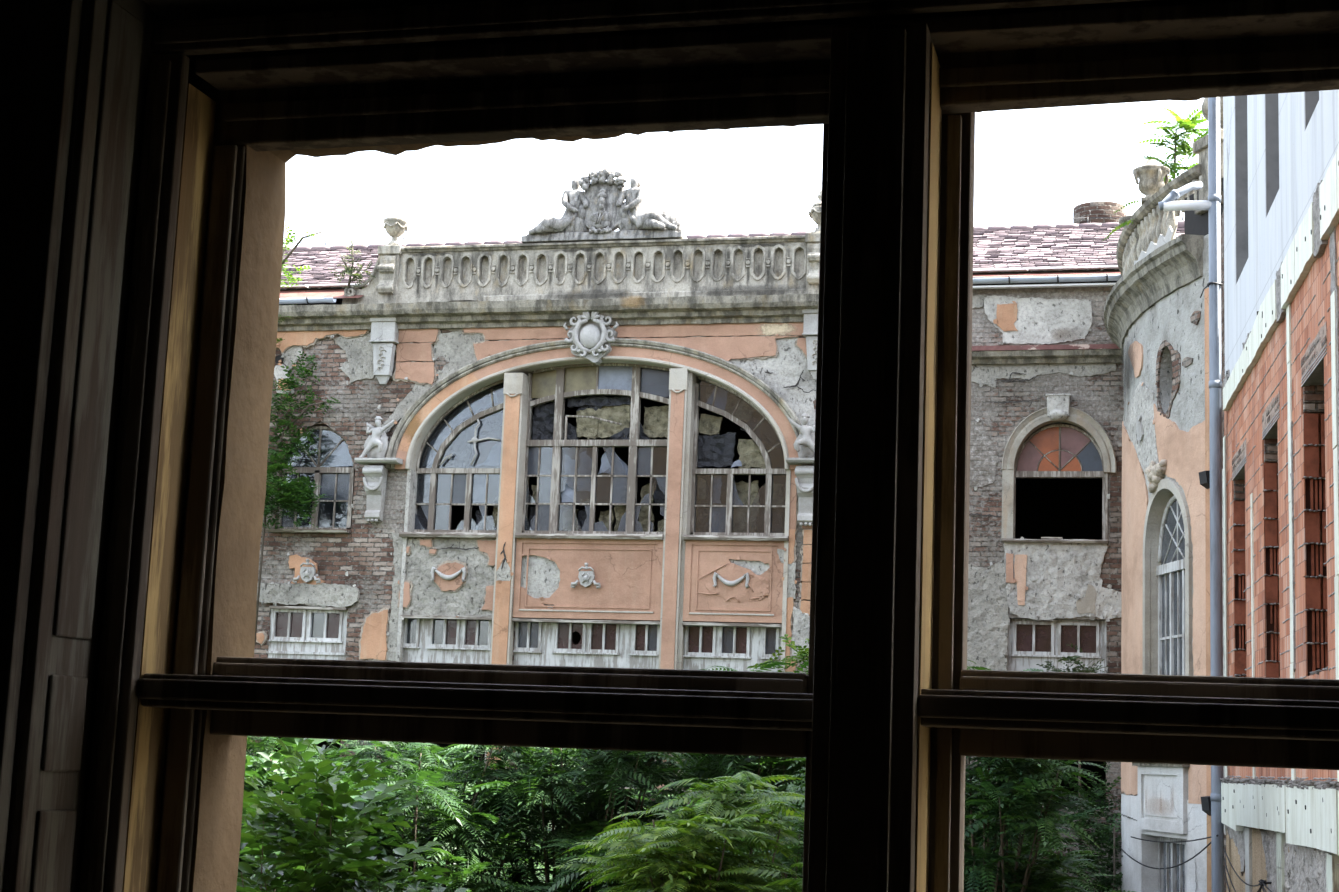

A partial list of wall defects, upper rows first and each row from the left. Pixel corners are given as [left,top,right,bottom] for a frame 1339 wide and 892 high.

flaking render [972,294,1092,345]
flaking render [1190,310,1201,325]
flaking render [729,334,816,426]
flaking render [254,328,560,661]
flaking render [967,340,1193,674]
flaking render [729,521,810,673]
spalling [1226,825,1332,892]